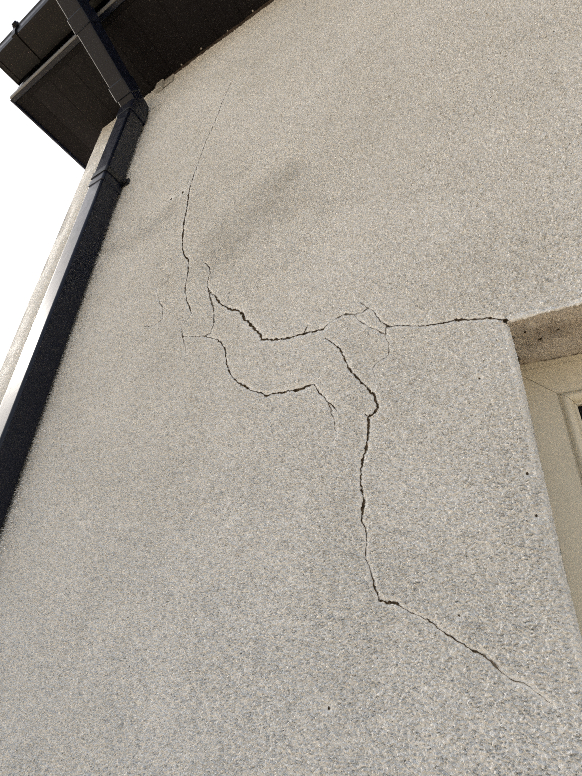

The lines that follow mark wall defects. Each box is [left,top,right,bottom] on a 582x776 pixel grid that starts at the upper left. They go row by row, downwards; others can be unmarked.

crack [181,83,551,704]